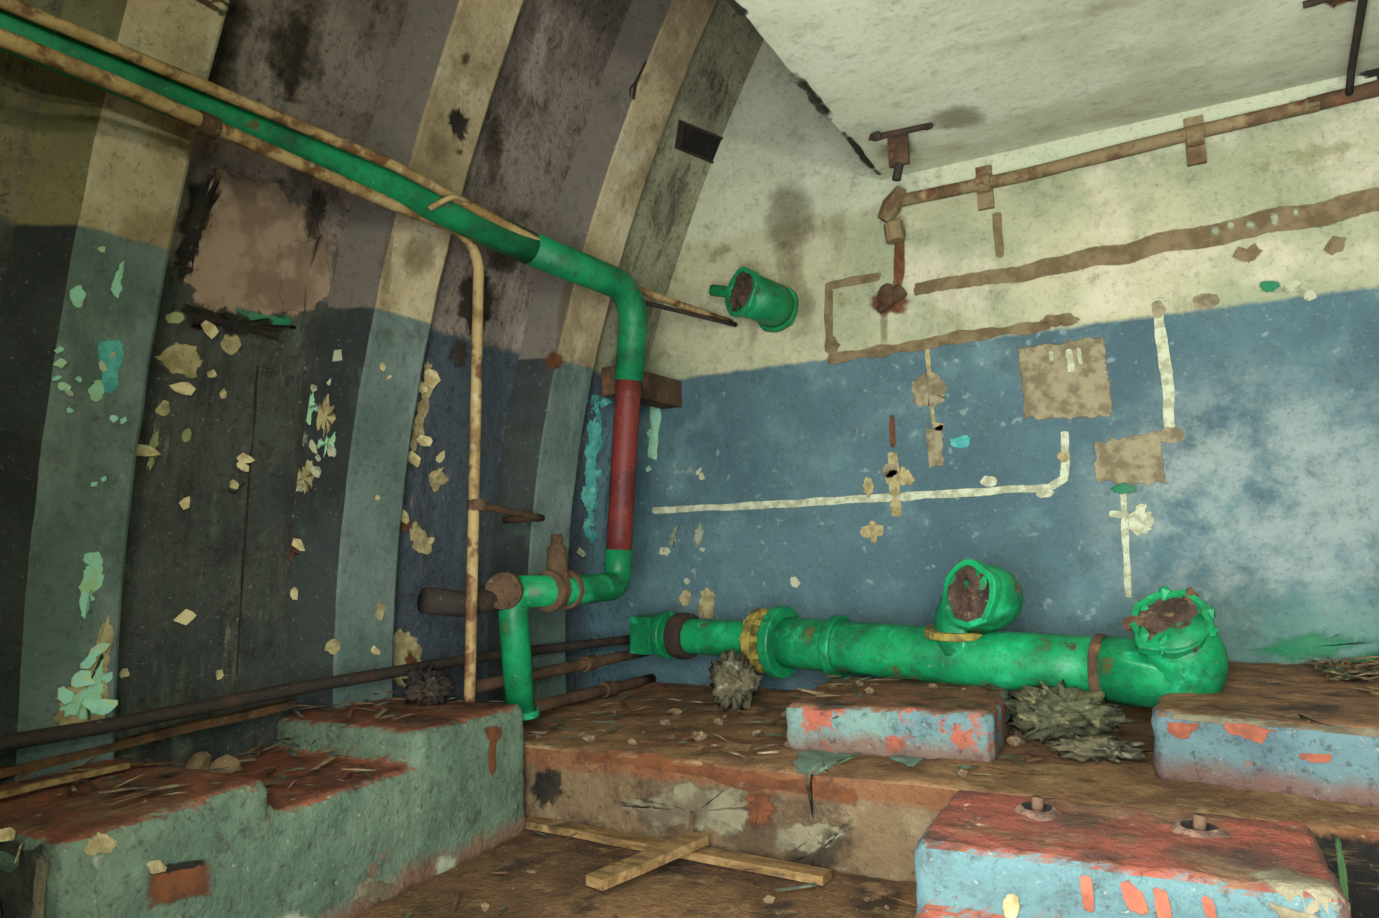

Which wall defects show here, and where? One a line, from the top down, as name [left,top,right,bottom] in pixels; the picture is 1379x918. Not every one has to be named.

water stain [208,1,251,89]
water stain [270,0,323,99]
water stain [175,175,221,281]
water stain [305,190,327,238]
flaking render [136,166,337,471]
water stain [184,304,292,341]
peeling [52,338,124,413]
flaking render [1017,337,1113,421]
peeling [296,378,336,494]
flaking render [1093,297,1184,598]
peeling [173,609,196,625]
peeling [1120,880,1172,918]